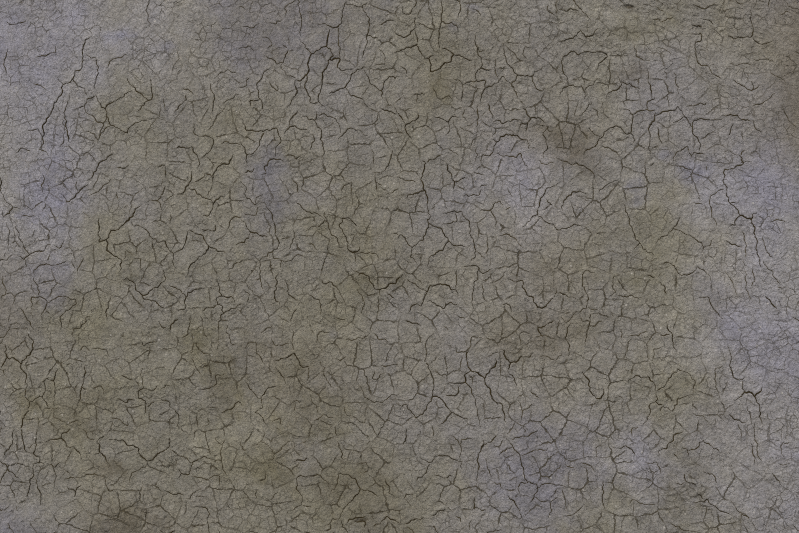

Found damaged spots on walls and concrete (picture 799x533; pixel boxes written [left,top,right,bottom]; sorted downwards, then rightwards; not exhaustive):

crack [18,37,193,155]
crack [61,154,127,202]
crack [98,2,419,498]
crack [0,176,242,533]
crack [361,335,531,435]
crack [582,319,790,486]
crack [417,431,581,517]